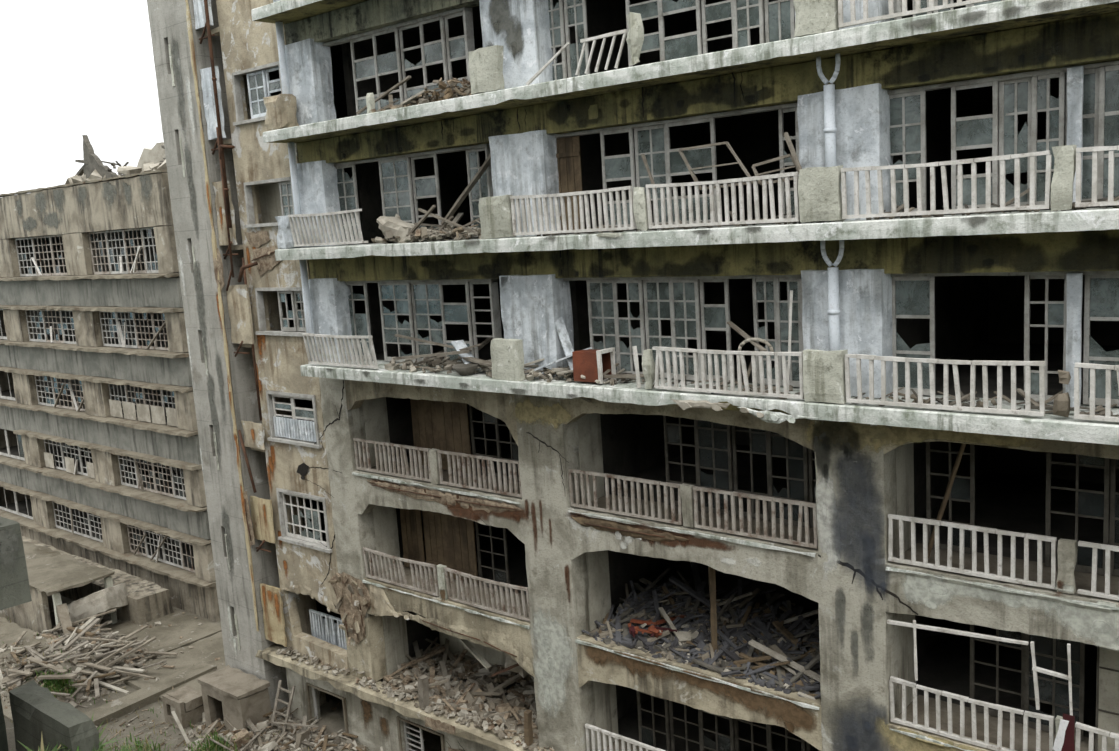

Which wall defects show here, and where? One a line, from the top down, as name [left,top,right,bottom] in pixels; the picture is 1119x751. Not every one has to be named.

water stain [487,0,523,57]
water stain [547,97,602,127]
water stain [652,82,772,118]
water stain [336,139,358,160]
water stain [512,389,577,428]
crack [305,380,344,498]
corrosion [370,480,552,550]
water stain [807,420,1031,593]
corrosion [251,571,280,621]
crack [818,554,918,615]
water stain [835,589,873,669]
water stain [834,702,885,751]